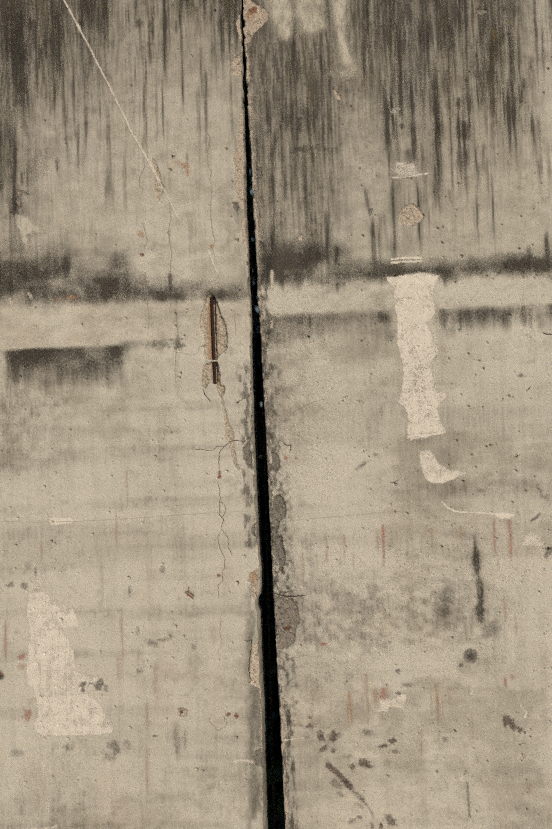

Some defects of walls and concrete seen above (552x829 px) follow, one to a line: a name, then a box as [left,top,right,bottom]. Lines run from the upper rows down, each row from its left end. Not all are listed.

spalling [231,0,269,273]
water stain [265,0,324,74]
water stain [332,0,369,76]
water stain [385,15,416,160]
water stain [261,222,341,288]
water stain [360,224,426,279]
spalling [398,203,424,227]
water stain [7,346,122,382]
spalling [199,294,253,469]
crack [55,436,251,598]
spalling [247,258,301,678]
spalling [280,696,290,824]